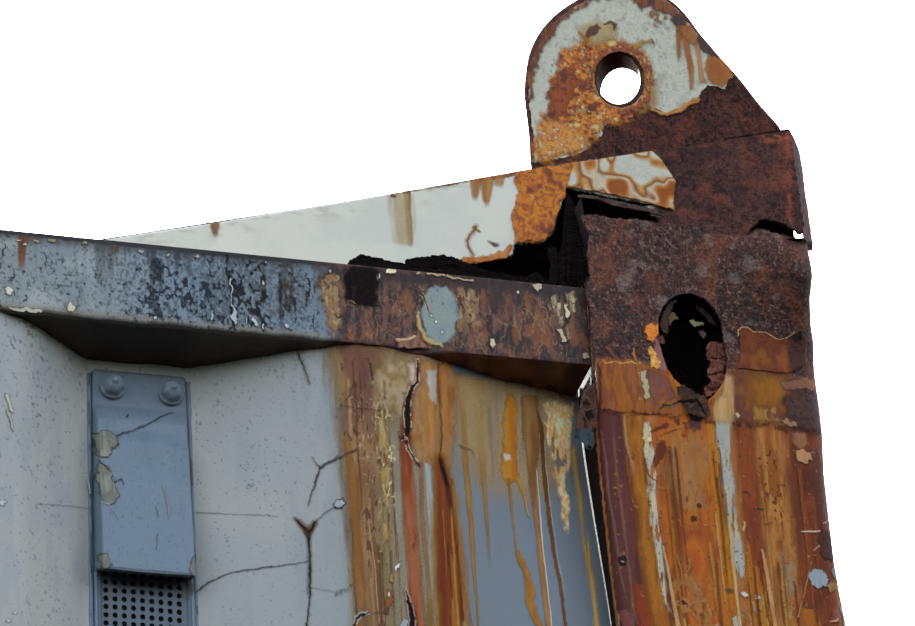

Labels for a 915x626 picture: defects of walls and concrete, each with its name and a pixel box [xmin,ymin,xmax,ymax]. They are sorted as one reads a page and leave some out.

corrosion [19,236,27,265]
corrosion [0,304,42,313]
peeling [396,272,474,349]
corrosion [315,0,842,626]
crack [117,412,173,436]
peeling [87,430,124,505]
crack [196,448,358,626]